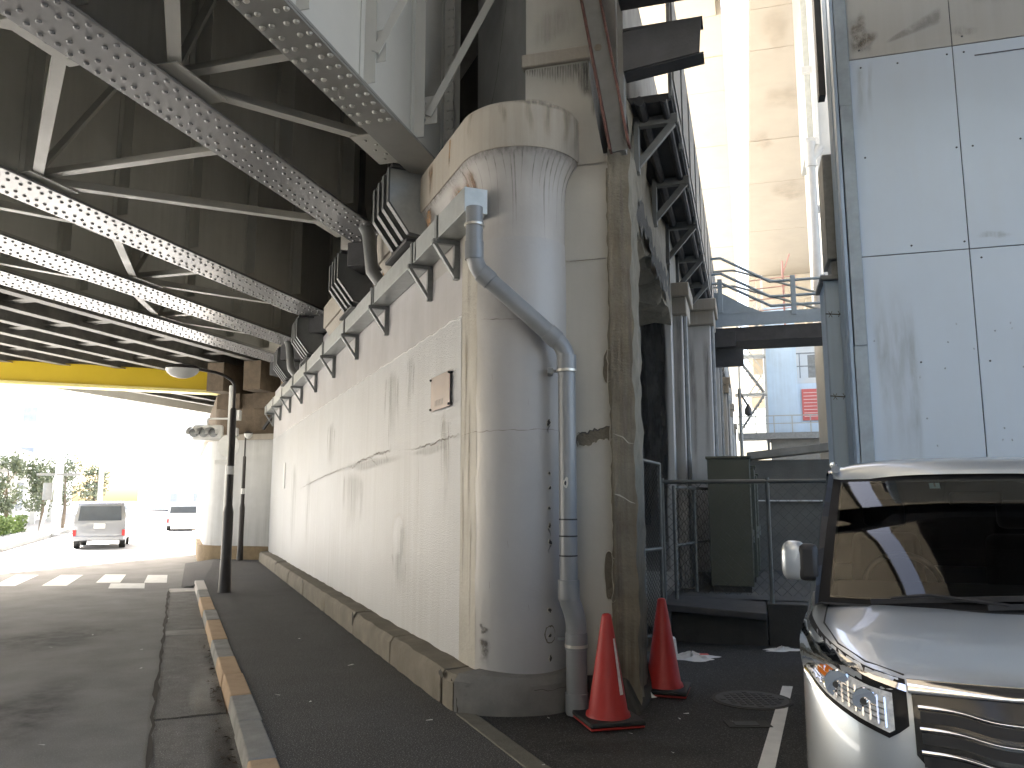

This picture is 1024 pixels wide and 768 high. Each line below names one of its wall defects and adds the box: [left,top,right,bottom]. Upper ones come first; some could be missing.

peeling [576,168,616,639]